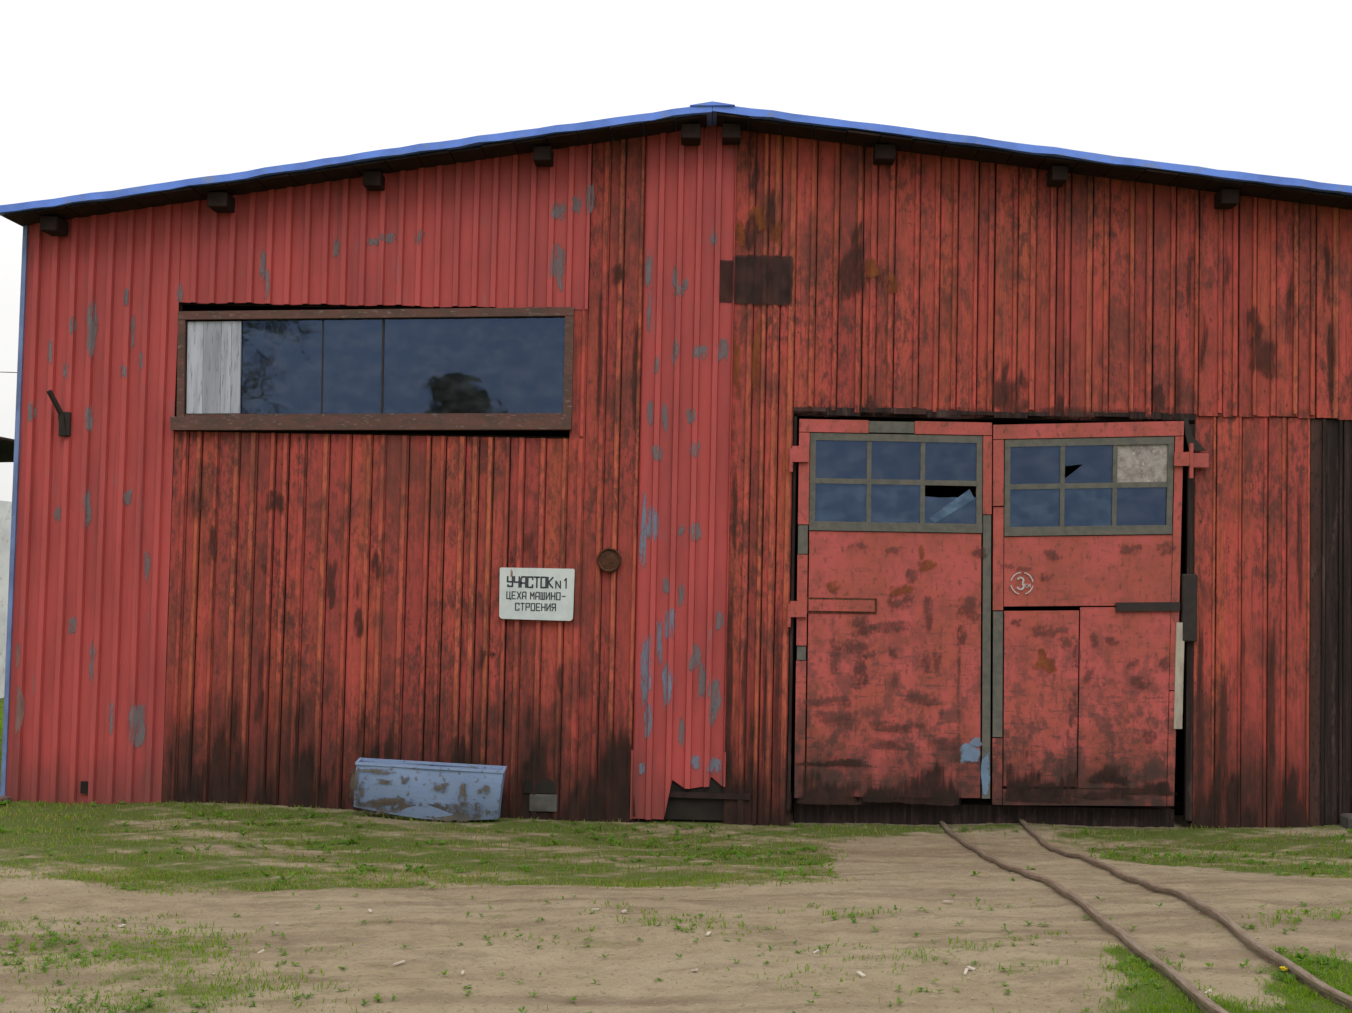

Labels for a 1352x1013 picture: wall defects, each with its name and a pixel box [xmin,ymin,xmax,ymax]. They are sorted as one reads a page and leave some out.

damp [745,136,775,250]
damp [838,223,889,298]
peeling [69,302,98,355]
peeling [654,338,728,375]
damp [1247,307,1276,379]
peeling [639,496,659,567]
peeling [640,578,684,738]
peeling [689,644,722,727]
peeling [804,569,932,725]
peeling [866,596,980,749]
rust [1036,648,1056,672]
peeling [933,734,990,795]